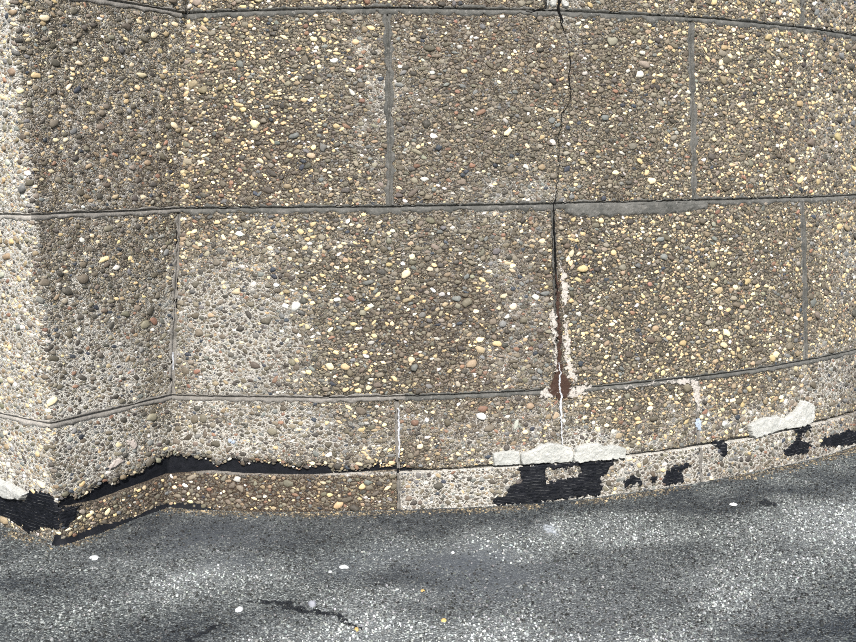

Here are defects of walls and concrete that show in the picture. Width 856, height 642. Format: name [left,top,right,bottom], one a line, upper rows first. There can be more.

crack [526,0,572,319]
damp [539,260,592,401]
rust [548,274,571,444]
damp [602,378,702,432]
spalling [0,452,412,534]
peeling [493,459,615,506]
peeling [623,462,691,489]
peeling [712,440,728,457]
peeling [783,424,856,458]